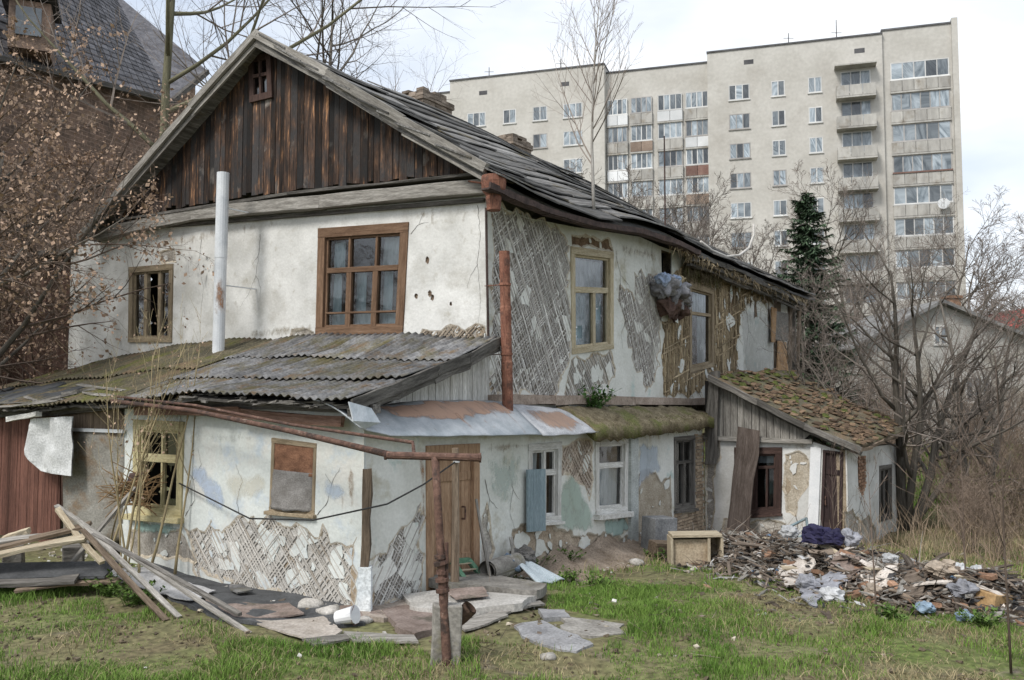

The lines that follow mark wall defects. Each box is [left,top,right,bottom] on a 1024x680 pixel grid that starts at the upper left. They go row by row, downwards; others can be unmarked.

spalling [420,202,616,396]
spalling [617,263,775,398]
rust [380,400,510,422]
rust [533,411,578,429]
spalling [511,433,737,565]
spalling [750,450,810,536]
spalling [129,515,358,605]
spalling [369,503,426,606]